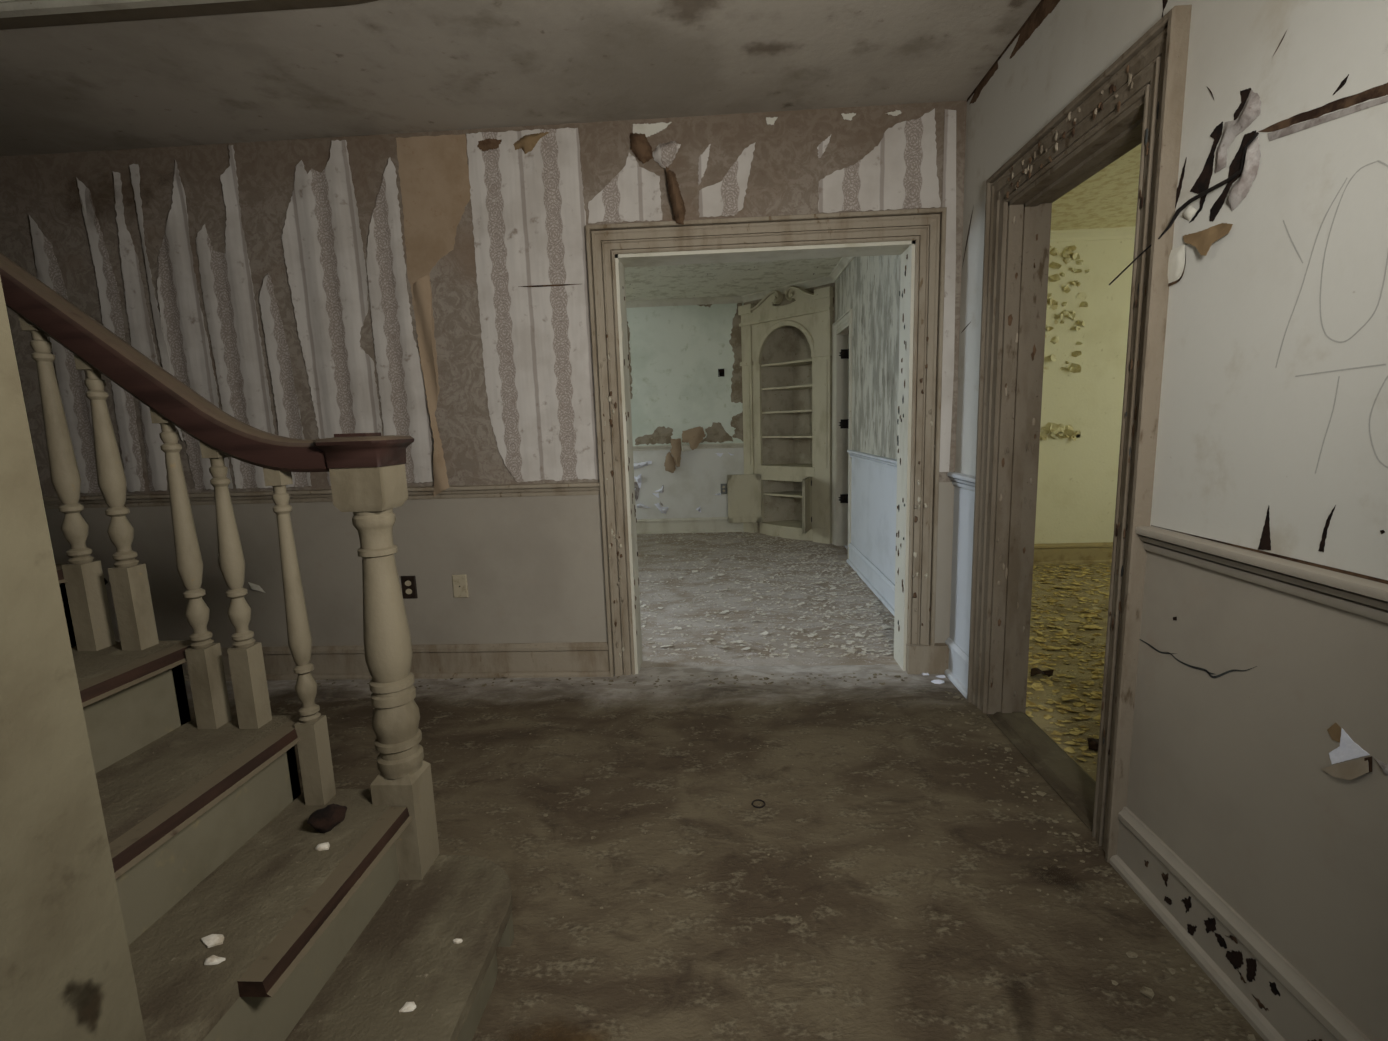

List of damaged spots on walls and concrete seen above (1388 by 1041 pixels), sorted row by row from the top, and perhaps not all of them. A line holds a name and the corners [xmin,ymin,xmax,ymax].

peeling [967,0,1060,105]
spalling [1167,88,1261,287]
peeling [603,391,668,657]
crack [1151,525,1388,584]
crack [1139,639,1257,678]
flaking render [1329,728,1370,764]
peeling [1144,860,1280,1011]